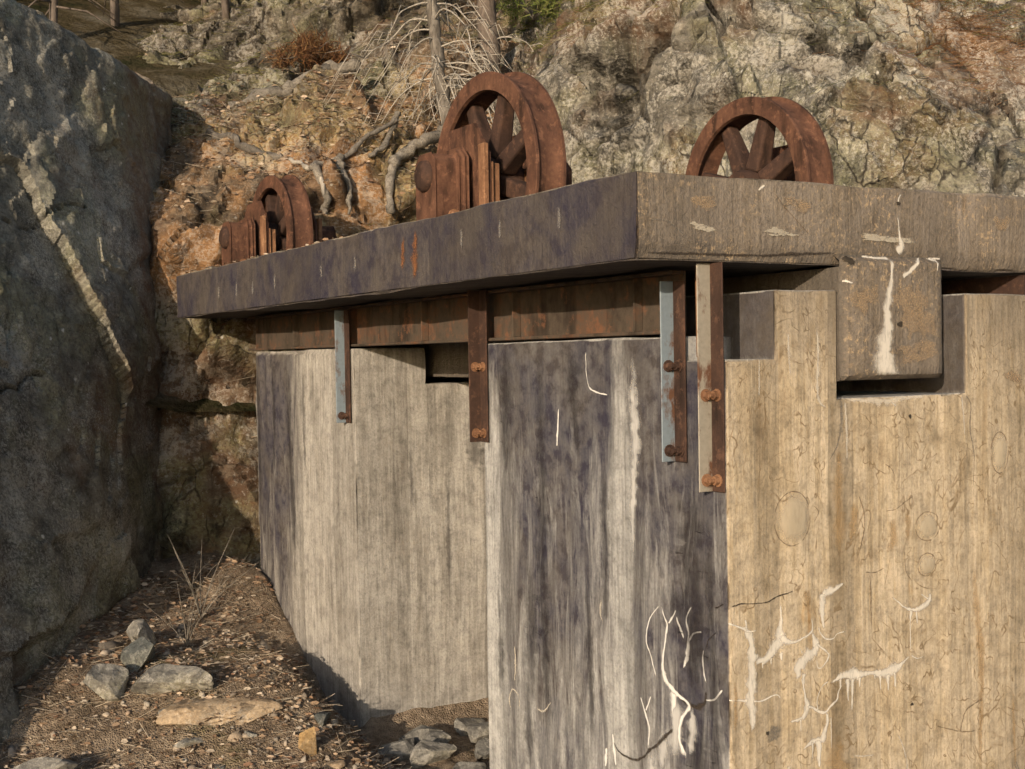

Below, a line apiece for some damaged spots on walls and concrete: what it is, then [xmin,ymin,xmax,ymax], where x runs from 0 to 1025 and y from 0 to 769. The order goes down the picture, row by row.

damp [630,383,640,546]
damp [649,705,695,769]